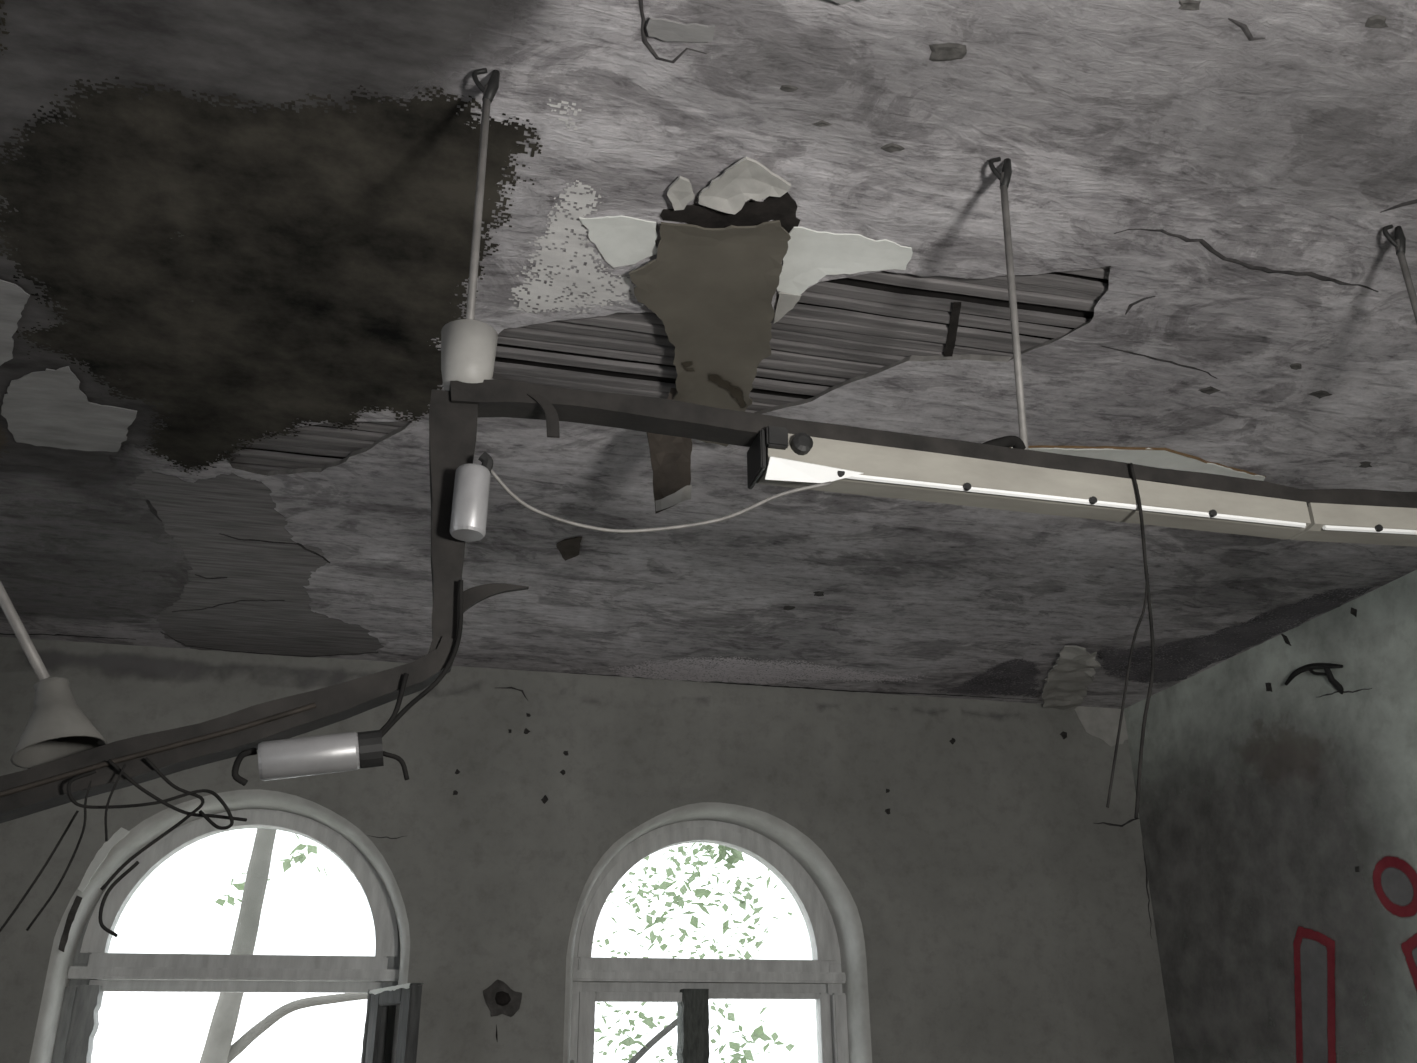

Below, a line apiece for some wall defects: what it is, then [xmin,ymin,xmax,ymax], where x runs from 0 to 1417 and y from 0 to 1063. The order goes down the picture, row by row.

crack [638,0,707,63]
peeling [0,279,30,366]
water stain [0,77,543,476]
flaking render [492,157,1111,414]
crack [1114,229,1379,292]
peeling [1,366,137,452]
flaking render [646,432,729,514]
peeling [1009,445,1266,481]
flaking render [131,420,412,657]
water stain [1135,752,1386,1063]